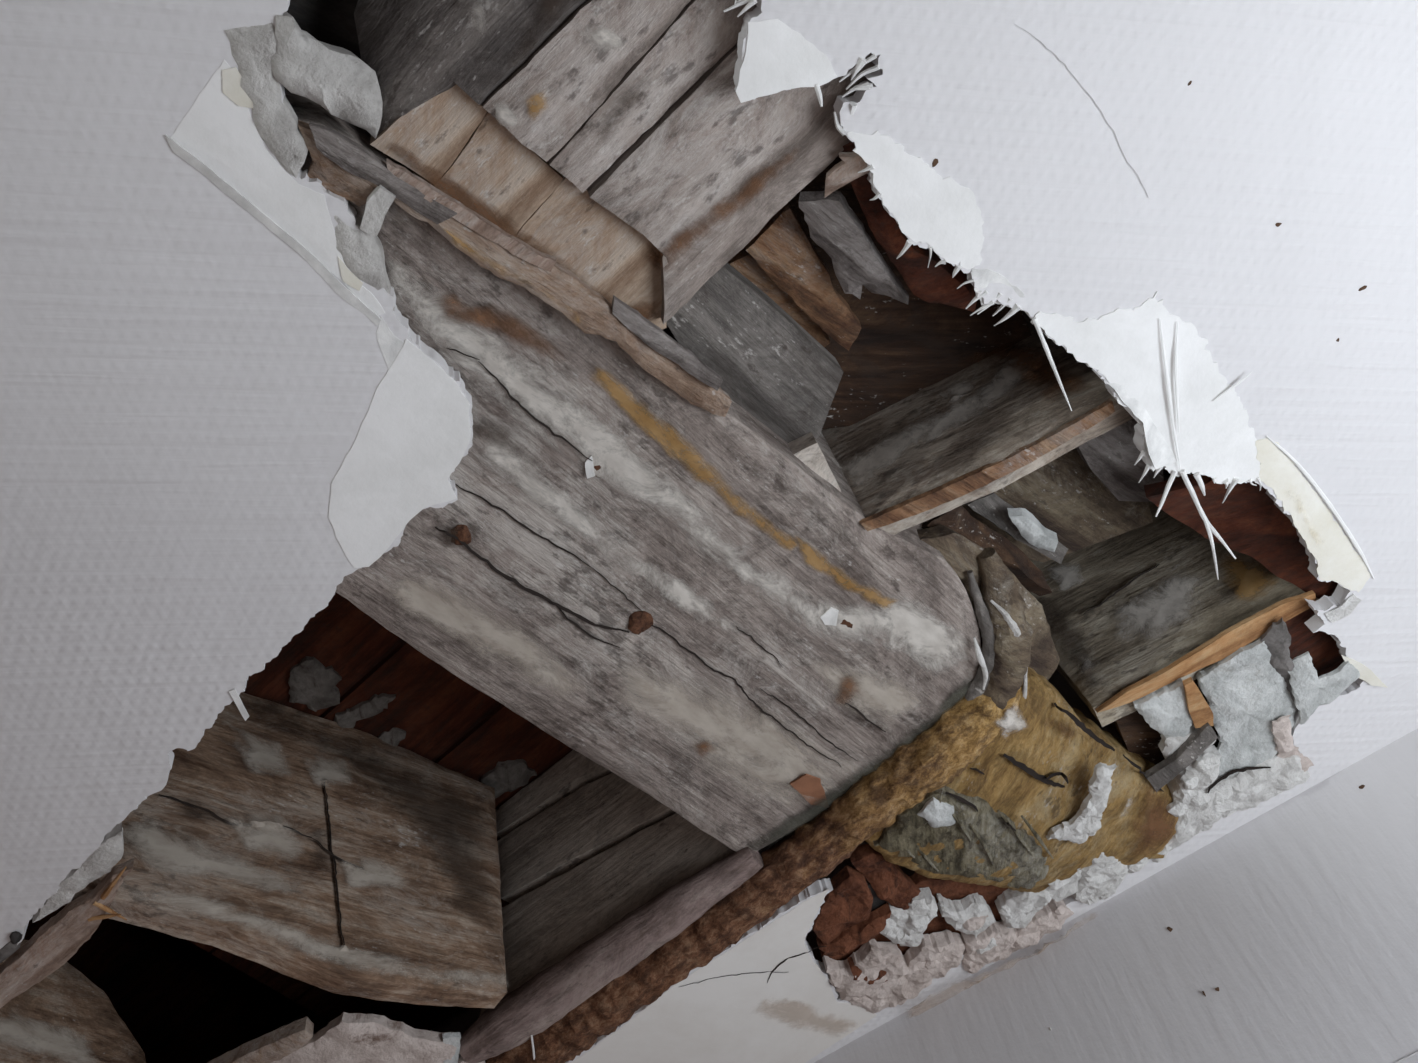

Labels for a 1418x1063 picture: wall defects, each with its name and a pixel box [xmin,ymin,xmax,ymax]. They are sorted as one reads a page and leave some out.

flaking render [171,23,396,316]
peeling [736,19,837,103]
crack [1015,24,1148,196]
peeling [847,131,1370,623]
flaking render [328,339,471,568]
peeling [585,455,595,479]
peeling [820,607,839,626]
peeling [229,688,249,721]
flaking render [0,822,124,963]
crack [680,946,827,987]
flaking render [571,745,1310,1063]
flaking render [272,1012,485,1063]